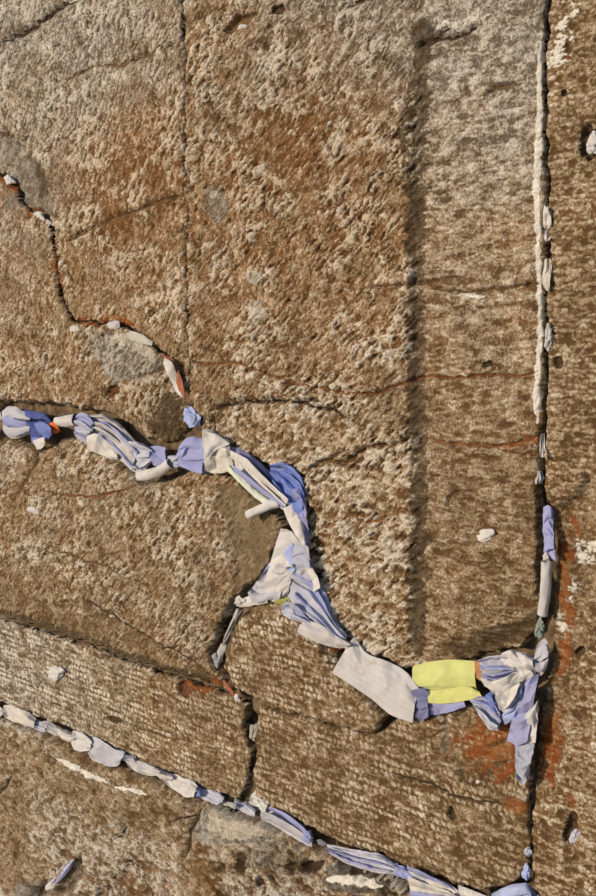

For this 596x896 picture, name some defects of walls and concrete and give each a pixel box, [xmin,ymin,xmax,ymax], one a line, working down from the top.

crack [2,0,78,42]
crack [412,23,479,48]
crack [71,195,183,242]
crack [195,361,539,432]
crack [305,435,540,476]
crack [395,774,527,808]
crack [37,883,48,896]